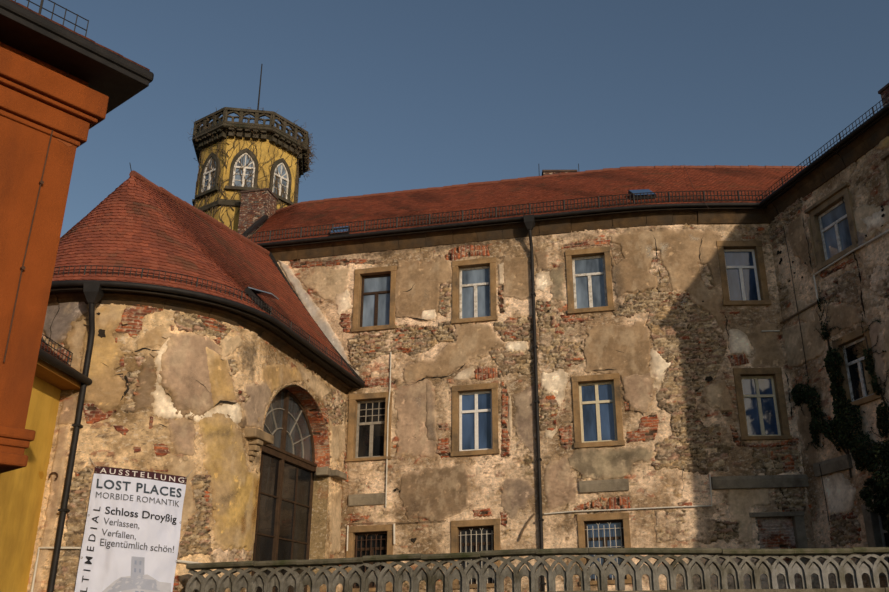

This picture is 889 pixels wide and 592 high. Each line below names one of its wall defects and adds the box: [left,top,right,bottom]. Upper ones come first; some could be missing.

flaking render [289,259,384,268]
spalling [768,197,803,264]
peeling [852,204,889,242]
peeling [864,254,889,387]
peeling [335,227,826,527]
peeling [33,304,370,592]
spalling [654,502,740,544]
peeling [820,471,862,547]